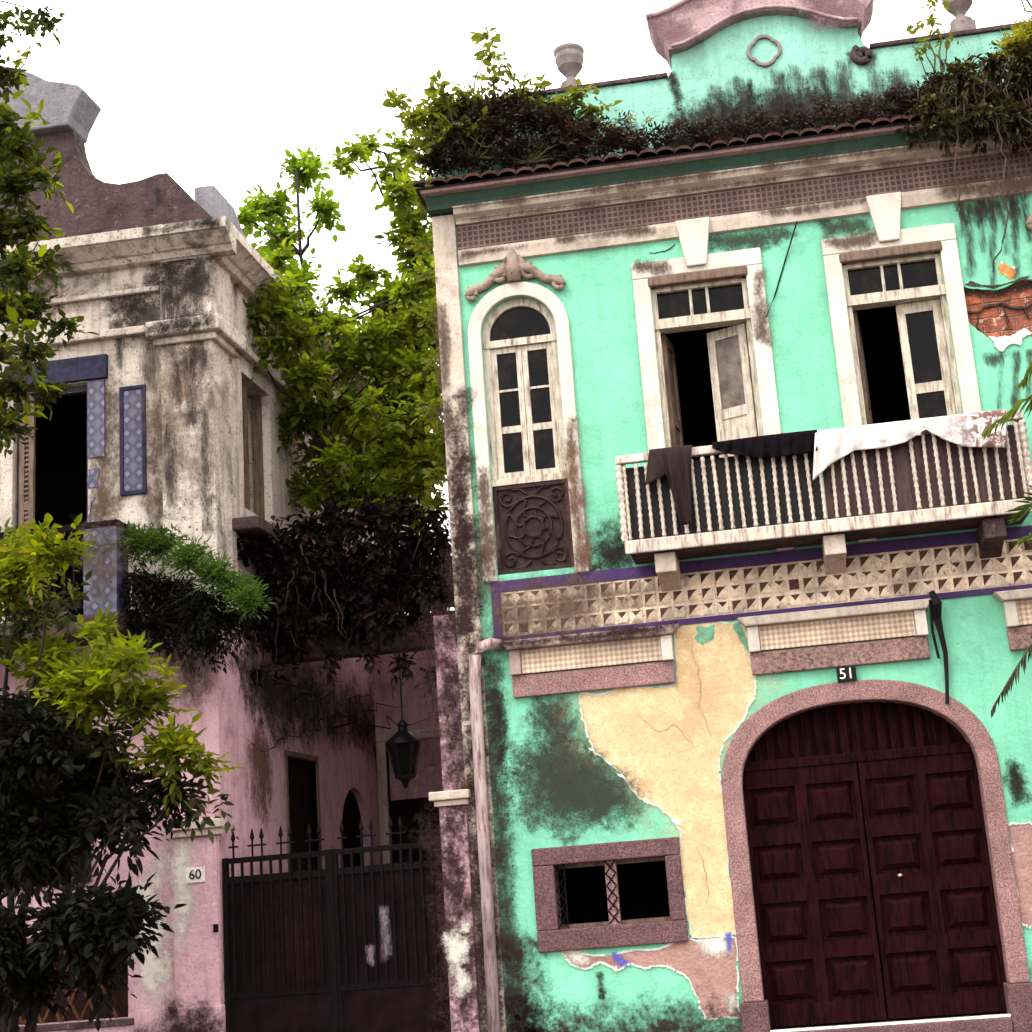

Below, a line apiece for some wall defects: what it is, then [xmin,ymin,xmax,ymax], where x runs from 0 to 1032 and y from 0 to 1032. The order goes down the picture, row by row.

damp [659,52,923,155]
damp [959,196,1032,287]
damp [115,321,125,367]
damp [142,264,205,322]
spalling [964,261,1032,352]
damp [141,335,235,531]
damp [413,306,743,1032]
peeling [561,620,757,1021]
damp [1003,760,1031,804]
damp [134,1000,224,1032]